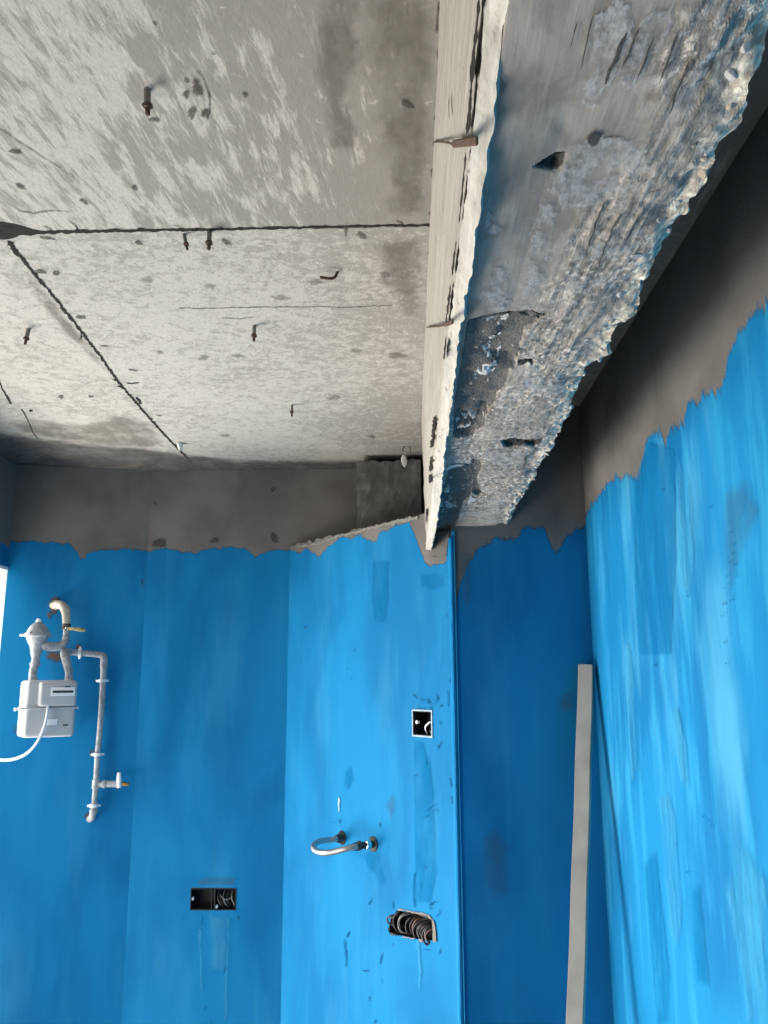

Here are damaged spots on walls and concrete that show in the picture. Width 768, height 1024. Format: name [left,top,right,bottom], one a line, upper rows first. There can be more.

spalling [739,41,751,54]
spalling [724,68,738,82]
spalling [587,134,600,147]
spalling [537,152,564,169]
spalling [453,309,546,439]
spalling [501,367,584,520]
spalling [429,459,486,558]